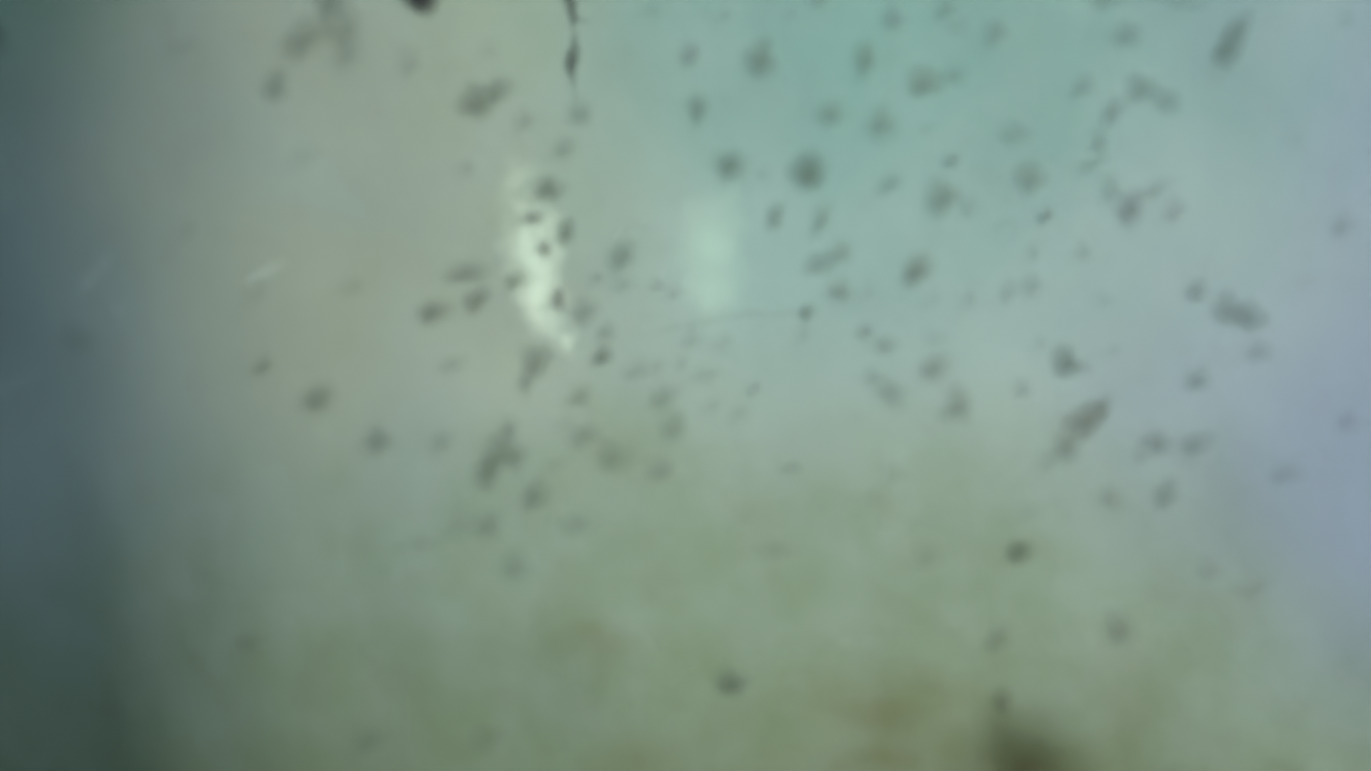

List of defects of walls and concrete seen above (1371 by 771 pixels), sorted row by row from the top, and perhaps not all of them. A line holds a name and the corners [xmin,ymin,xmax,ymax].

crack [568,54,577,70]